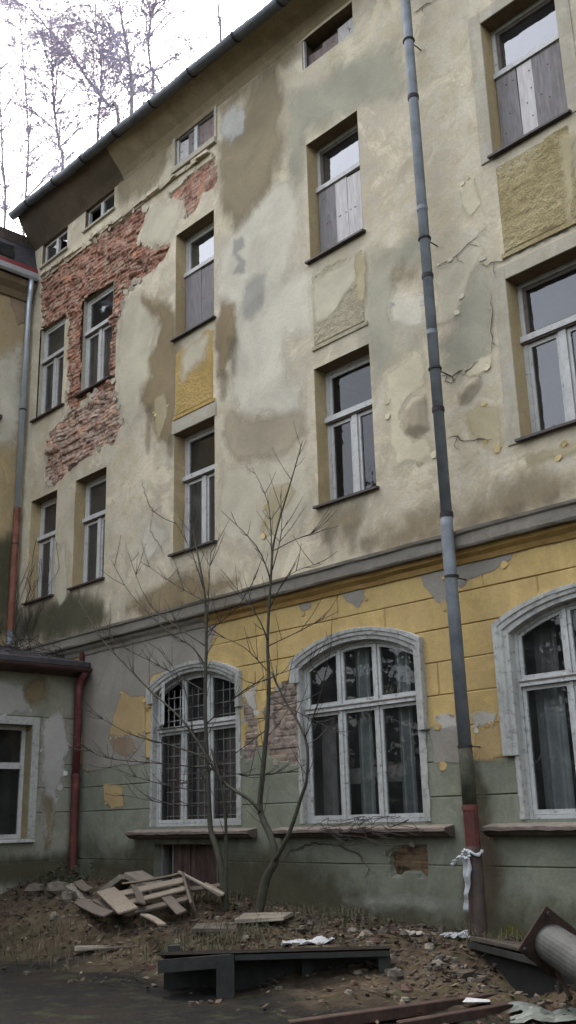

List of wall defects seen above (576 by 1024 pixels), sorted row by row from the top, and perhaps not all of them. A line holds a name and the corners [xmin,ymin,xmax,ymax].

flaking render [167,151,218,218]
flaking render [38,205,170,487]
leakage [142,299,179,444]
crack [437,227,572,383]
crack [447,435,491,448]
leakage [0,535,105,642]
peeling [421,553,513,612]
peeling [40,624,216,839]
flaking render [240,681,302,765]
peeling [430,714,459,771]
peeling [472,711,503,760]
flaking render [382,841,429,876]